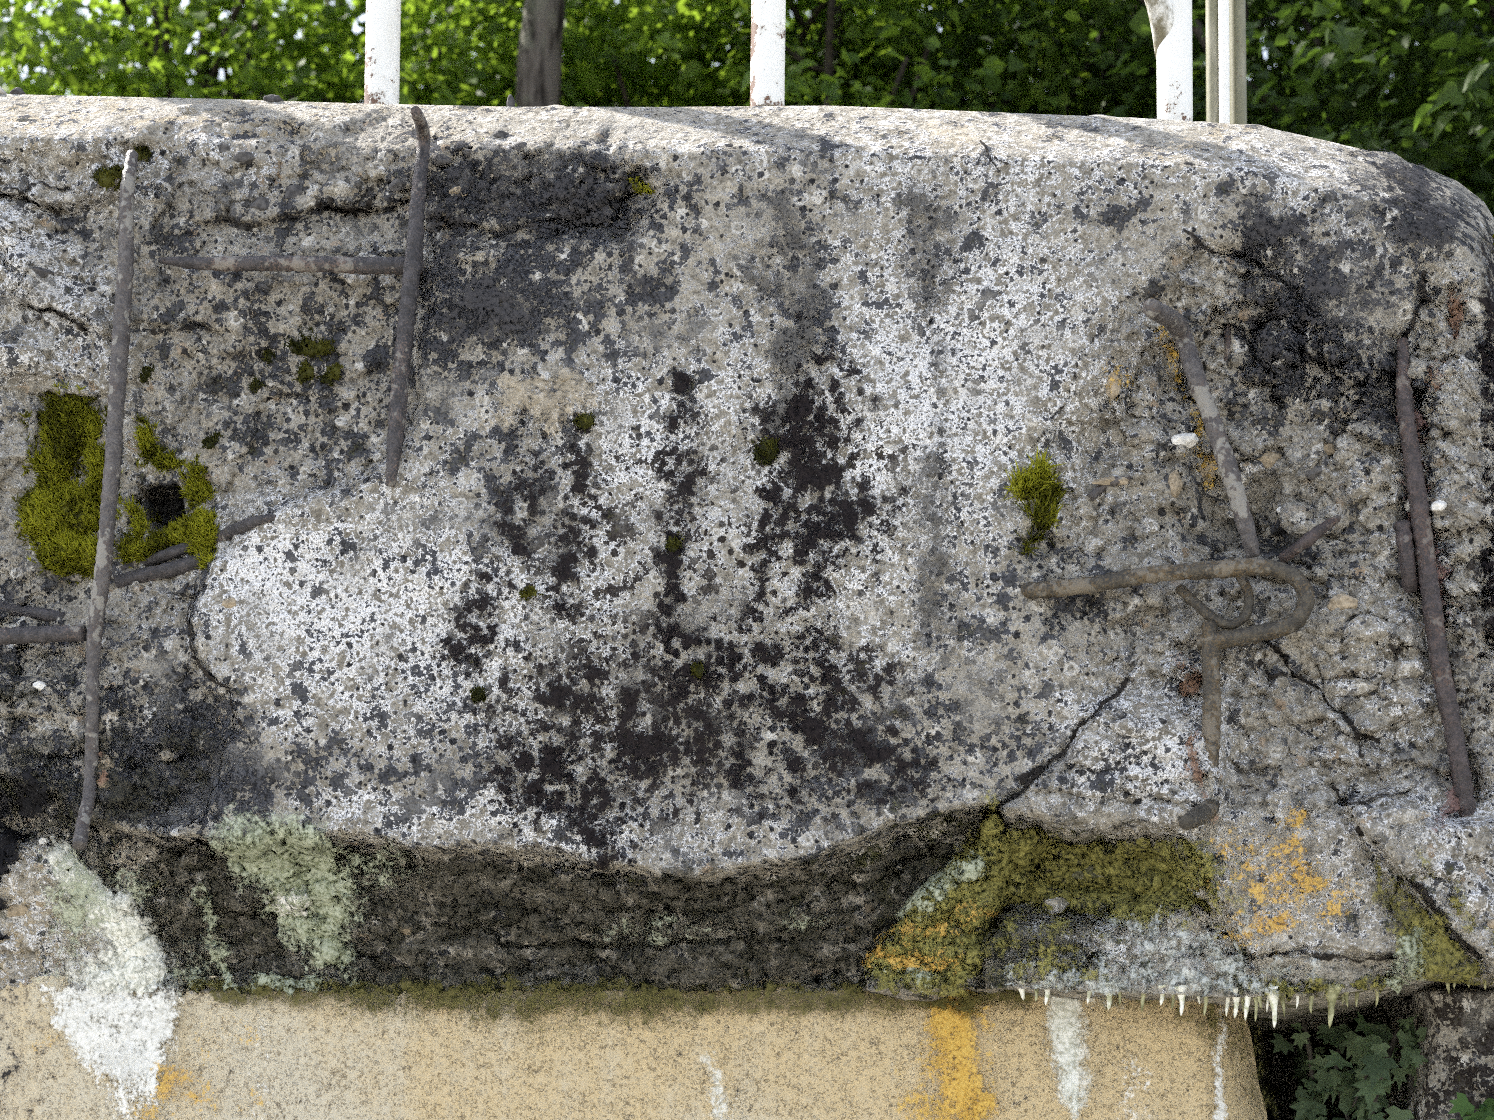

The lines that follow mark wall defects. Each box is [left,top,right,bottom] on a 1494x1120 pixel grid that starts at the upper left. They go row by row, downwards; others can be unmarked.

rust [1155,326,1216,489]
damp [1224,148,1472,436]
rust [1394,291,1468,443]
damp [1474,227,1494,492]
damp [0,185,1424,1120]
spalling [0,104,1494,993]
damp [1474,548,1494,659]
crack [985,677,1130,832]
rust [897,990,998,1120]